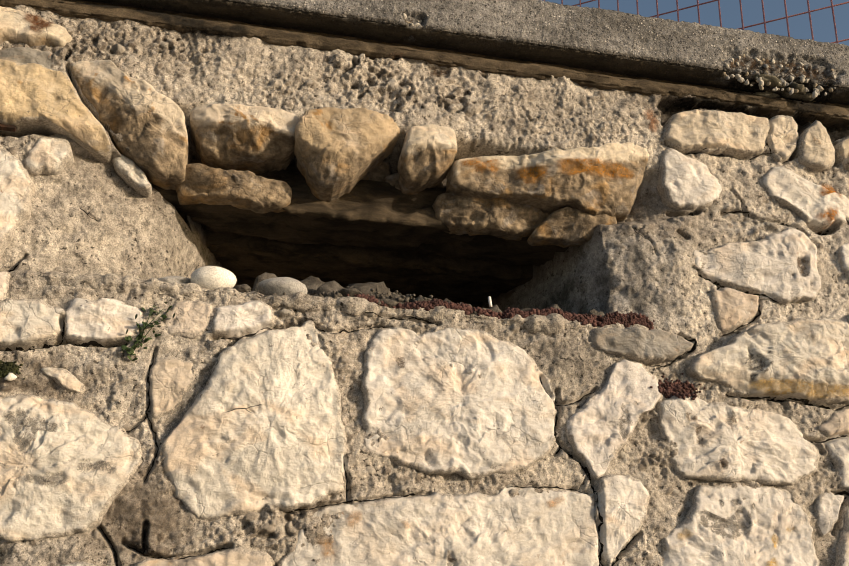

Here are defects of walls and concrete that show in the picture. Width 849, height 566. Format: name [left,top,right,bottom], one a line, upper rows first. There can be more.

spalling [722,54,838,102]
crack [4,321,105,352]
crack [123,349,159,482]
crack [510,377,637,566]